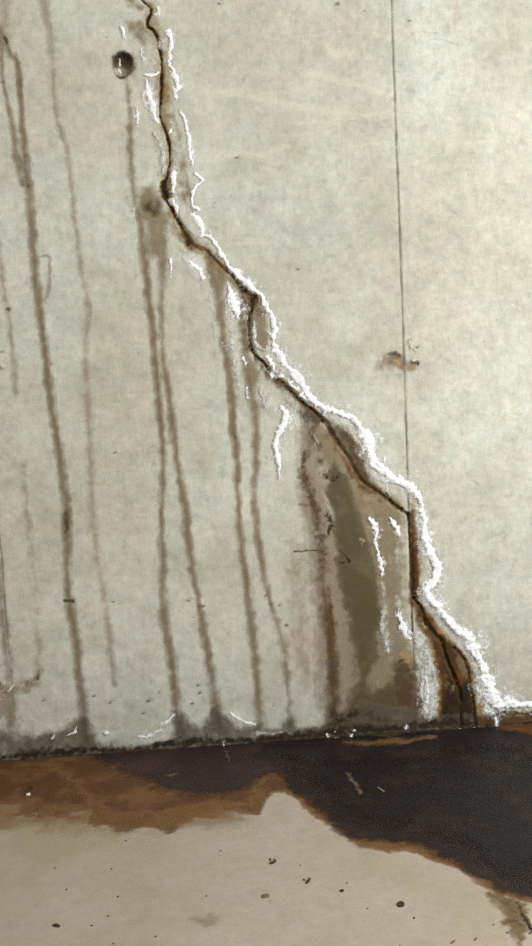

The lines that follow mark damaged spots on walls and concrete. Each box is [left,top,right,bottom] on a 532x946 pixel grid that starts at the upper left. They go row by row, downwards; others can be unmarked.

leakage [0,27,532,762]
crack [141,0,476,728]
leakage [486,892,532,946]